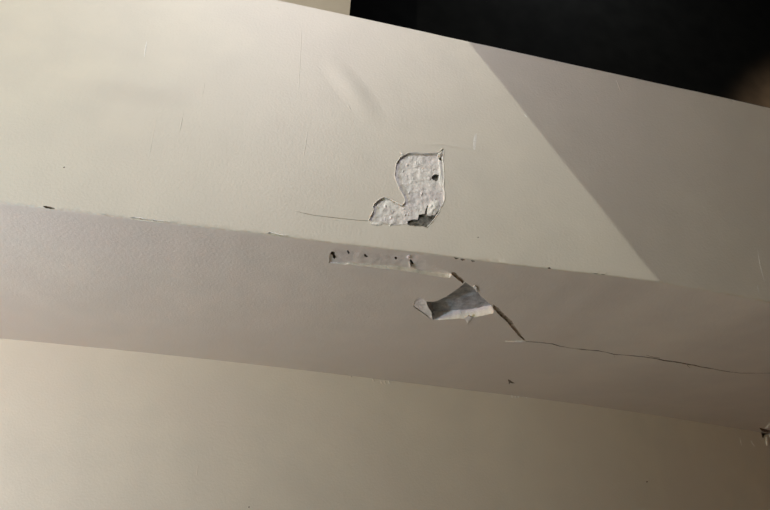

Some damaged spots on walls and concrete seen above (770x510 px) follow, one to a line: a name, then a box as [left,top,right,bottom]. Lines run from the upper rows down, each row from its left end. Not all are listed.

flaking render [368,148,445,228]
flaking render [329,250,452,278]
crack [451,272,464,283]
flaking render [413,282,494,323]
crack [493,305,738,373]